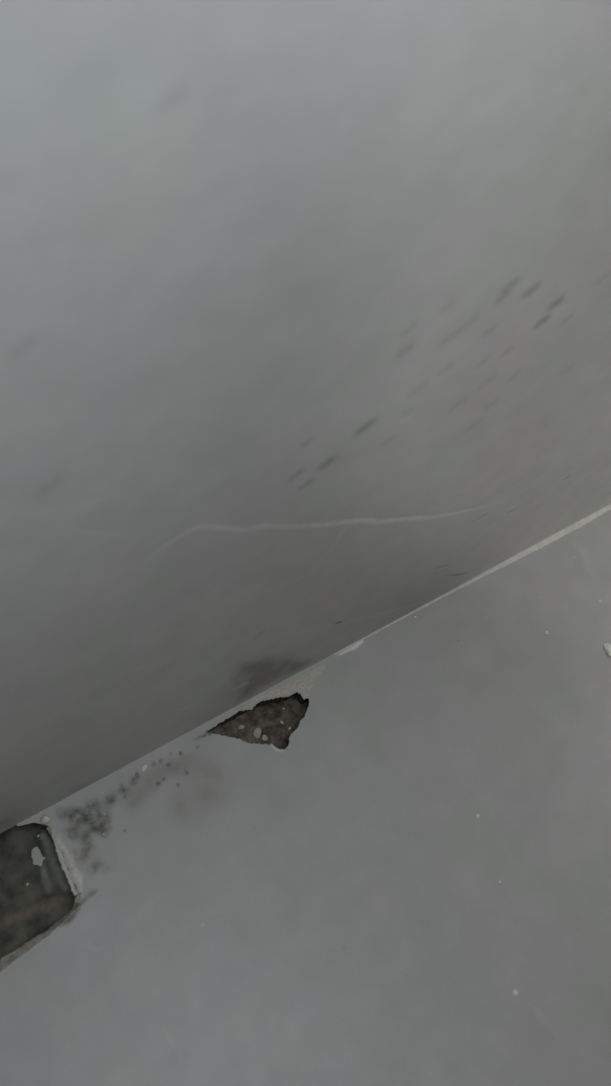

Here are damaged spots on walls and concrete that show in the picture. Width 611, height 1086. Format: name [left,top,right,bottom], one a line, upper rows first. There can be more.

peeling [337,640,364,656]
spalling [207,662,328,753]
spalling [0,823,86,972]